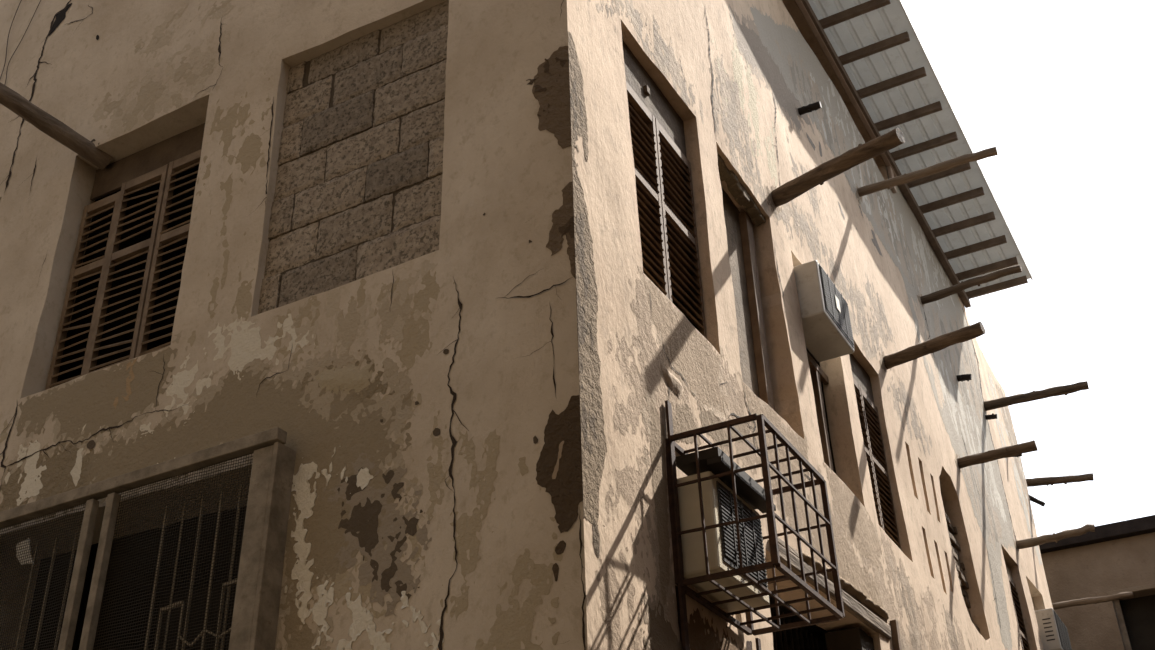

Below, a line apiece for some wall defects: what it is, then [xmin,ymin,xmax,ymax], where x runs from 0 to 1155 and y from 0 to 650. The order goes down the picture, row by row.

crack [0,0,93,197]
crack [703,9,720,140]
peeling [730,14,822,166]
spalling [838,184,883,257]
crack [0,354,187,487]
peeling [0,313,444,650]
crack [436,277,469,650]
spalling [526,31,607,582]
crack [662,339,784,451]
peeling [911,294,943,400]